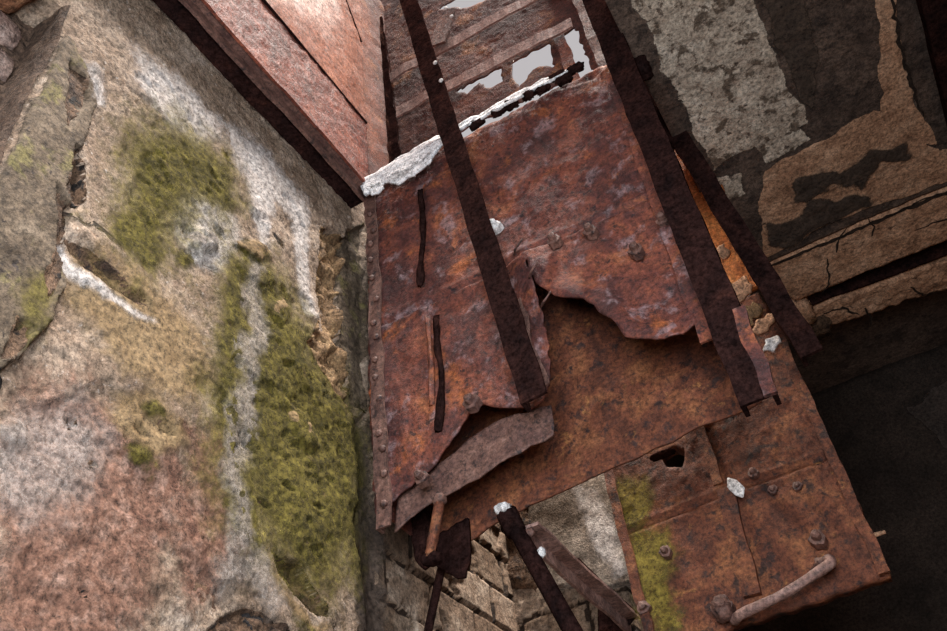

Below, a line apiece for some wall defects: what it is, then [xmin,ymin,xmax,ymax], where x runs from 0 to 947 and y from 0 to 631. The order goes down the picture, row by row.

flaking render [0,35,97,389]
leakage [92,69,103,103]
leakage [138,55,318,315]
peeling [717,244,731,260]
flaking render [631,0,947,257]
spalling [306,222,388,631]
spalling [193,582,290,631]
spalling [271,552,335,631]